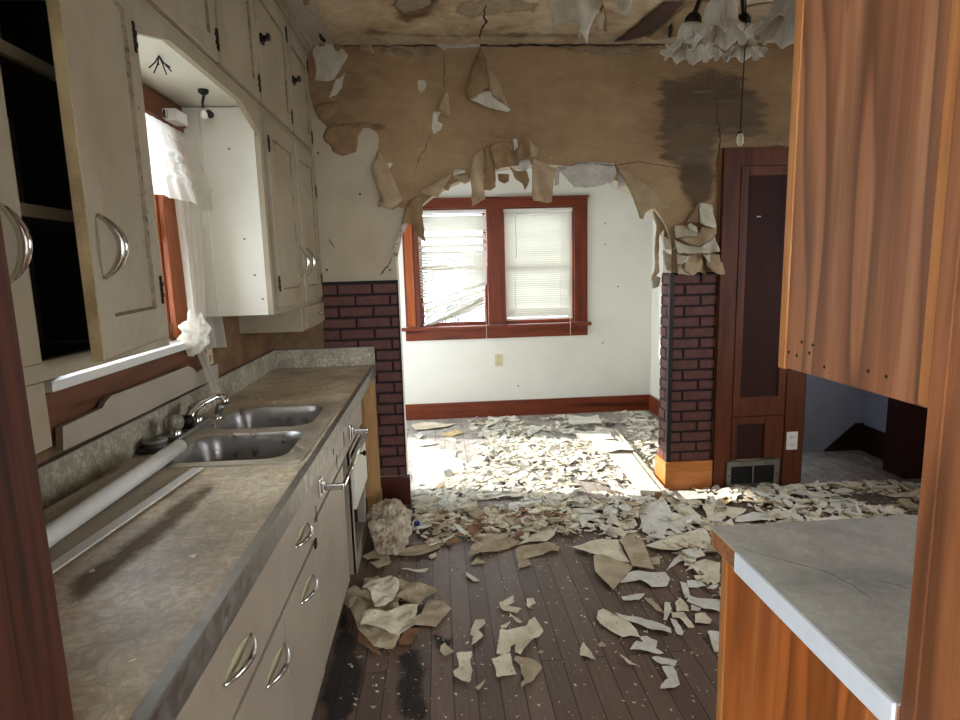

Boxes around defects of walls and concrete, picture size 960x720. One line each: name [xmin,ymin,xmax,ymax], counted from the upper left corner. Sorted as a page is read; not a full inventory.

crack [479,5,671,47]
peeling [307,44,386,156]
crack [342,44,446,92]
peeling [432,92,450,134]
peeling [436,44,511,113]
leakage [657,69,766,205]
peeling [371,136,555,260]
peeling [616,164,669,219]